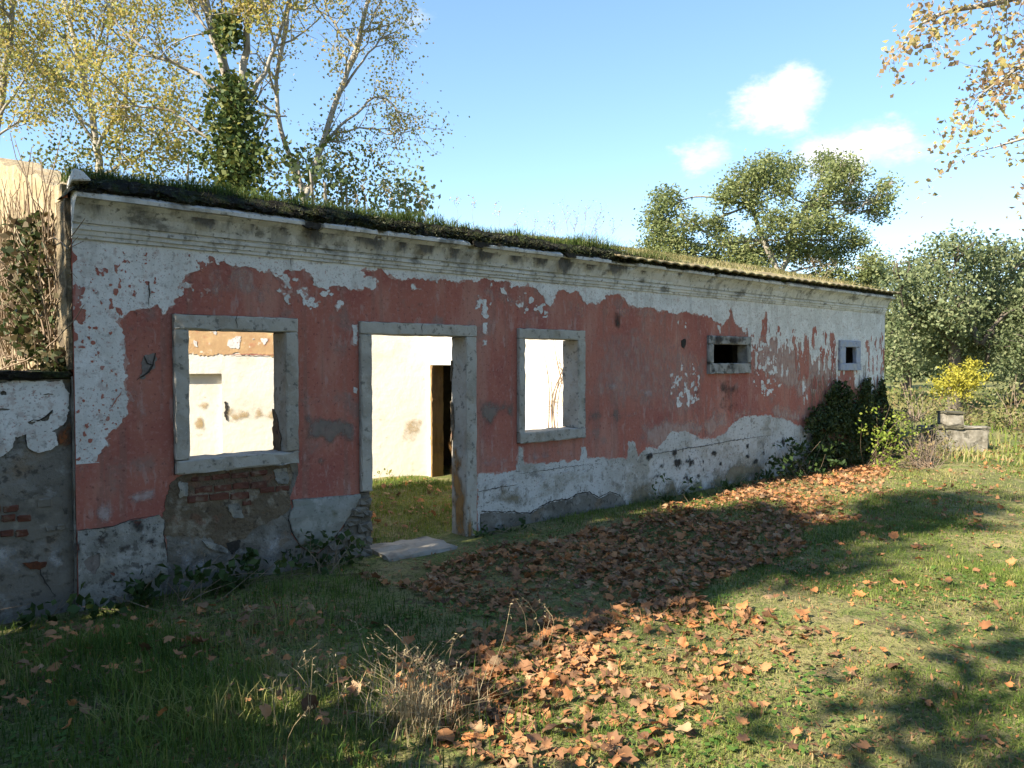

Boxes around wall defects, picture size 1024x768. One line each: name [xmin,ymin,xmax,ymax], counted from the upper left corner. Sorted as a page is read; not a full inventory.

peeling [0,238,885,464]
flaking render [78,463,373,611]
peeling [477,414,815,533]